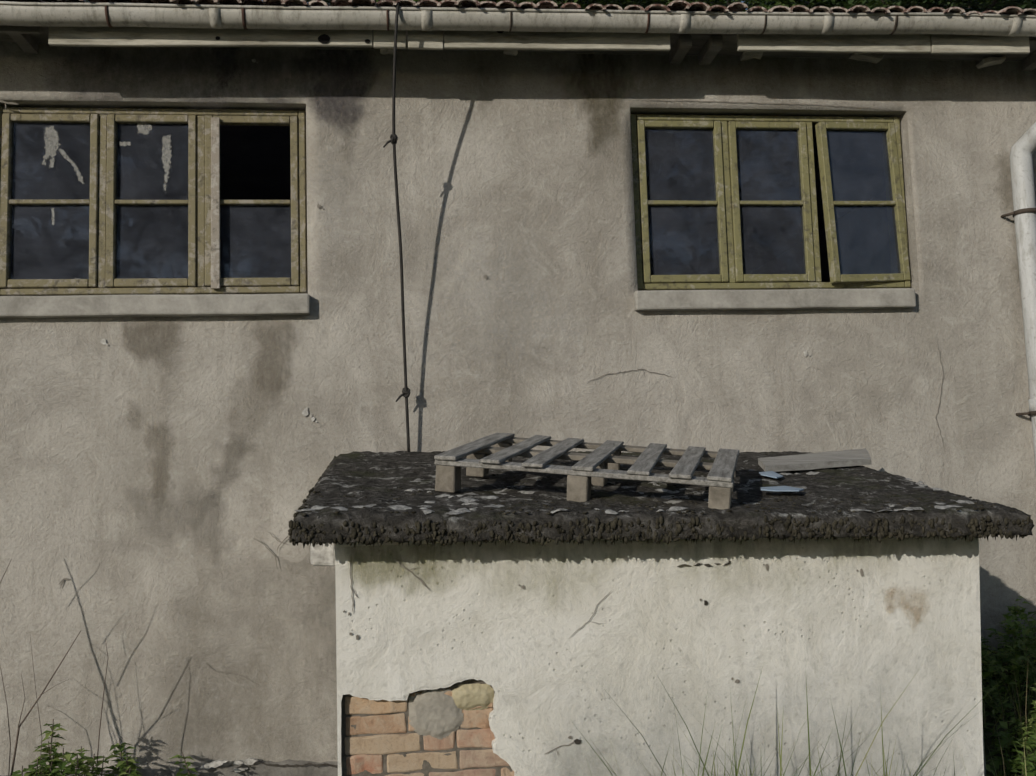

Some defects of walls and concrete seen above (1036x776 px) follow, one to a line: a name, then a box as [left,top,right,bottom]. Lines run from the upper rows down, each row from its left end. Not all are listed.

crack [590,369,671,381]
flaking render [342,676,518,776]
crack [254,761,338,769]